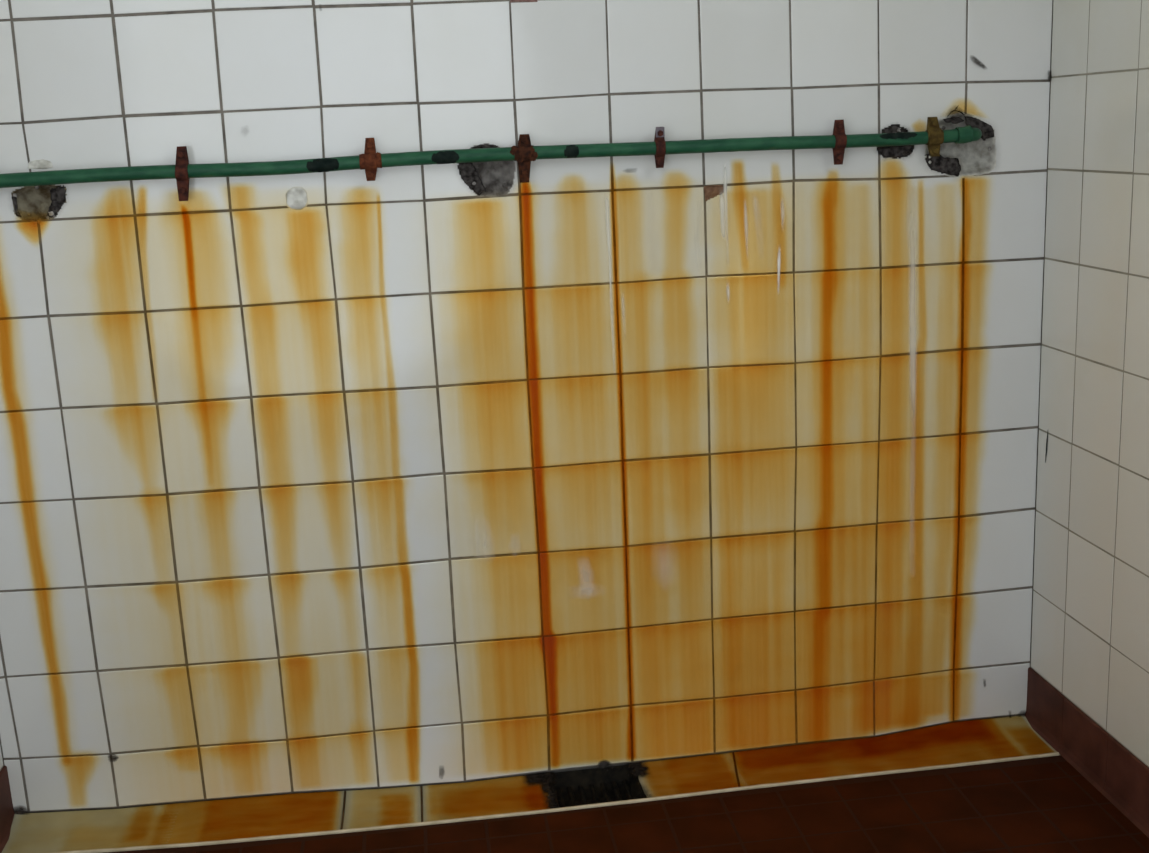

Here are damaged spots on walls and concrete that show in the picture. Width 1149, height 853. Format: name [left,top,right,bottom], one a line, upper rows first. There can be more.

spalling [431,143,516,197]
corrosion [510,145,538,164]
spalling [877,114,996,178]
spalling [11,185,67,224]
corrosion [524,185,554,716]